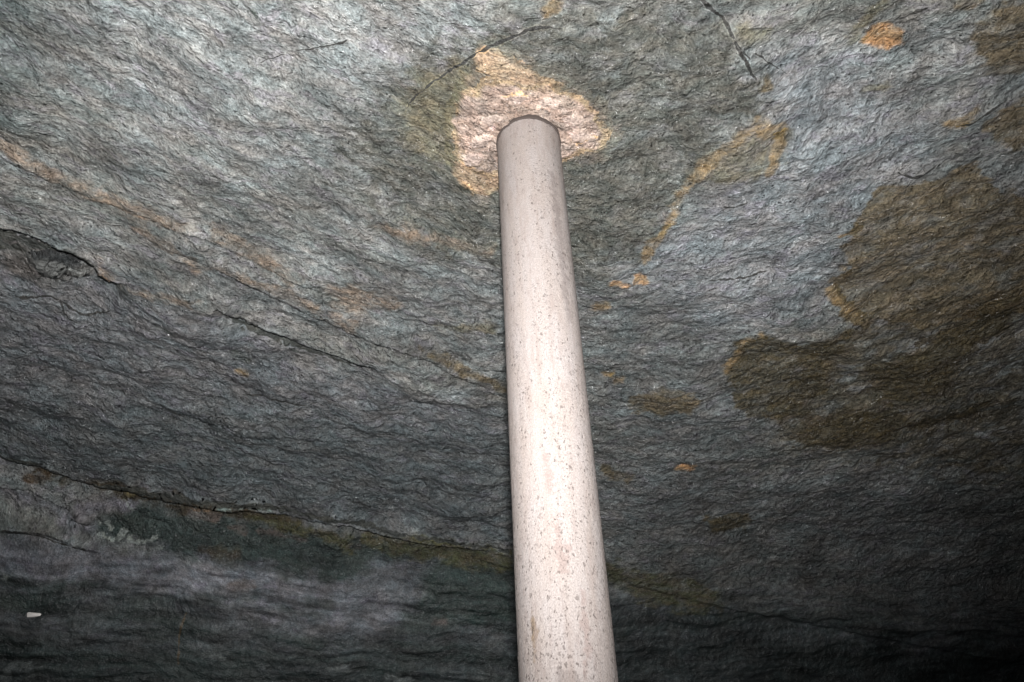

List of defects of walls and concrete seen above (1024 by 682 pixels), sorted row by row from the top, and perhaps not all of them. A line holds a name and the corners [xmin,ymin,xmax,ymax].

crack [697,0,790,83]
corrosion [836,0,911,54]
spalling [448,39,613,196]
corrosion [585,113,800,314]
crack [0,527,88,551]